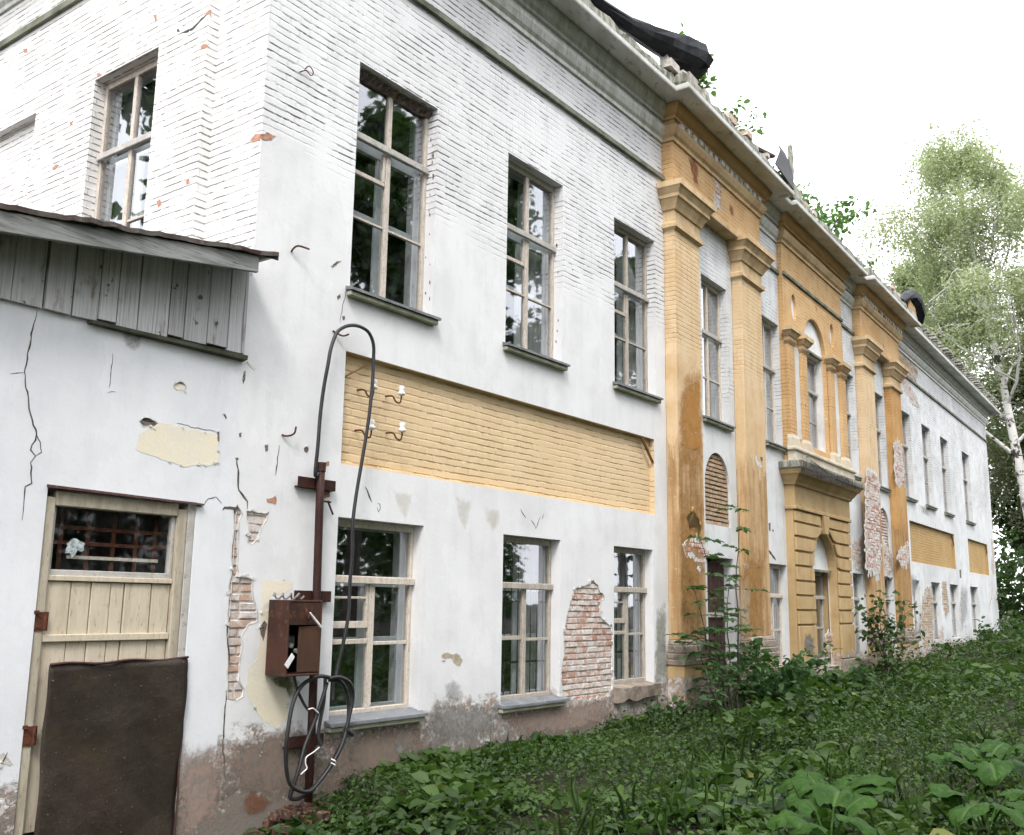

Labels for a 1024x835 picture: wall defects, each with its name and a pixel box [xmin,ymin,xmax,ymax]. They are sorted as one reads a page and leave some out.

crack [11,312,42,519]
peeling [136,416,221,467]
crack [197,460,248,510]
crack [224,617,232,660]
spalling [226,495,293,730]
spalling [561,579,614,701]
leakage [681,379,702,473]
leakage [681,492,703,627]
spalling [851,467,910,582]
crack [220,692,228,780]
leakage [177,707,495,834]
leakage [516,700,610,732]